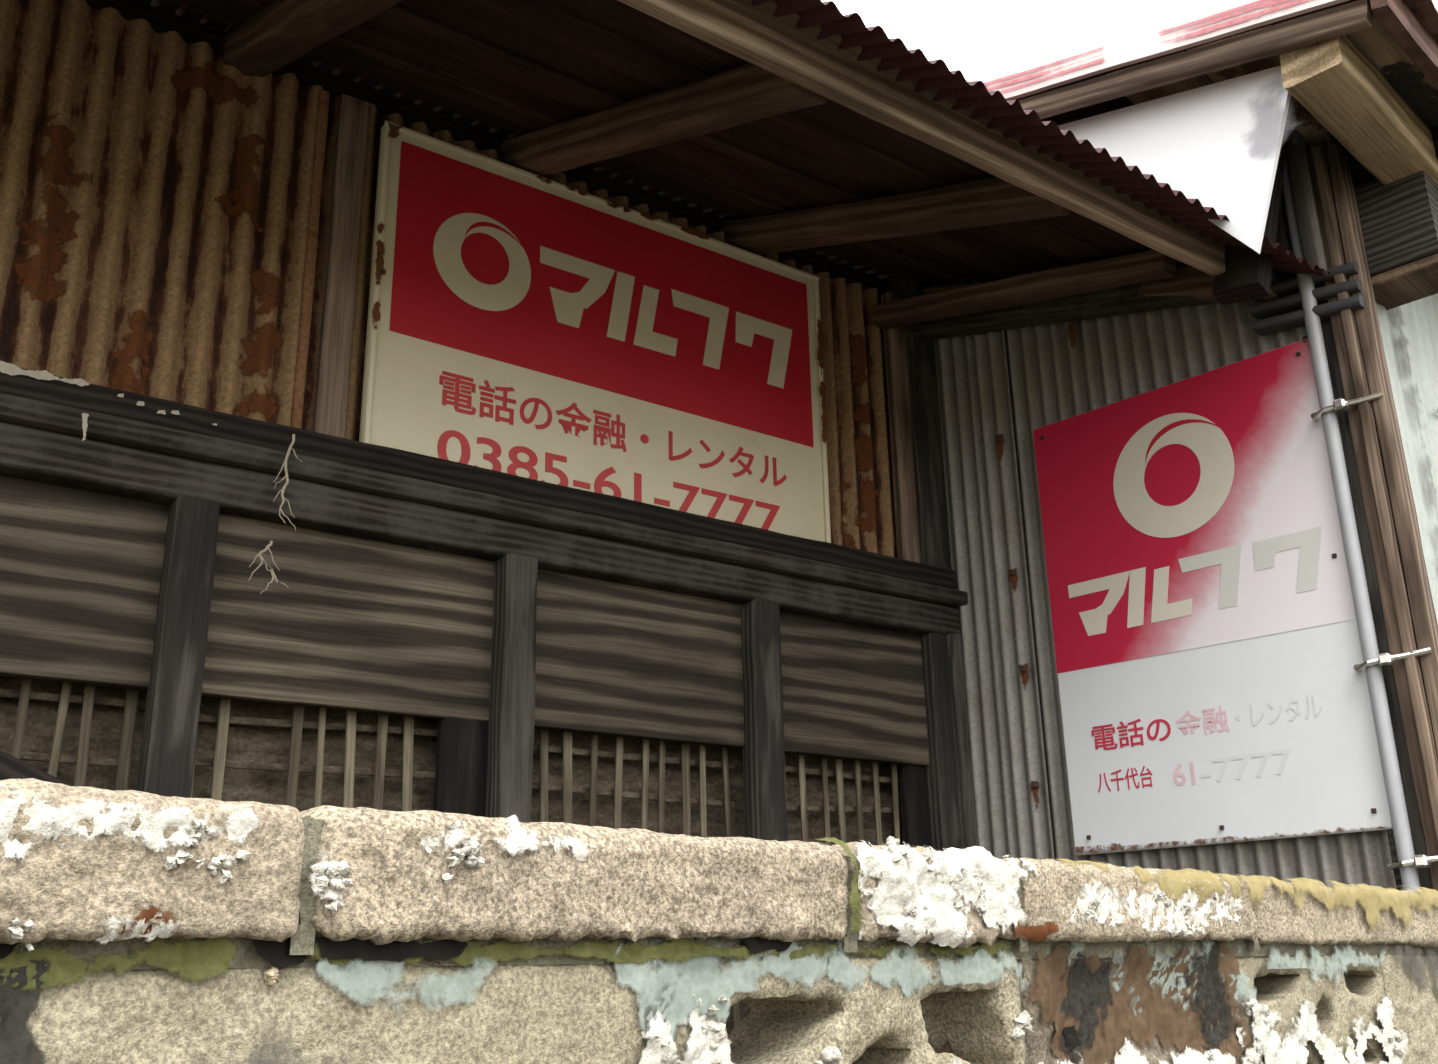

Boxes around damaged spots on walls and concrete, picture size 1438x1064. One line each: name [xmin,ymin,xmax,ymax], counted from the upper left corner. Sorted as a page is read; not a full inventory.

rust [171,62,261,117]
rust [13,113,94,302]
rust [233,266,288,423]
damp [0,784,259,884]
damp [96,914,180,943]
damp [857,836,1037,948]
damp [1066,881,1242,937]
damp [0,917,50,1064]
damp [639,995,734,1064]
damp [815,1045,844,1064]
damp [1011,1010,1034,1040]
damp [1115,996,1408,1064]